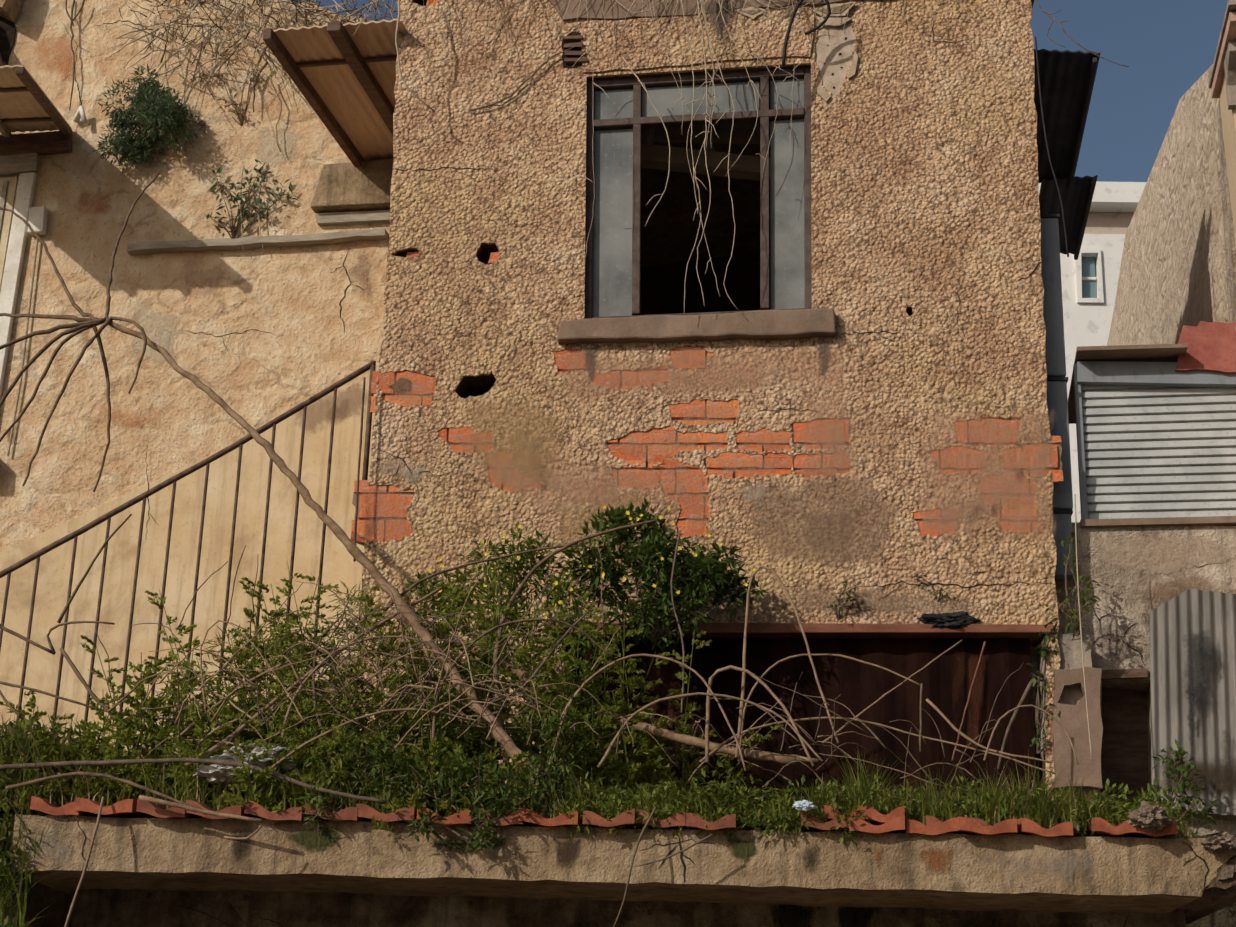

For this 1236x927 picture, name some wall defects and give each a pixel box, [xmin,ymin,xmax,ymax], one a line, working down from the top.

crack [330,250,365,330]
flaking render [552,346,713,389]
flaking render [370,370,435,413]
flaking render [606,399,852,538]
flaking render [350,480,415,546]
flaking render [913,508,960,537]
spalling [1207,856,1236,890]
water stain [772,904,812,927]
water stain [838,907,878,927]